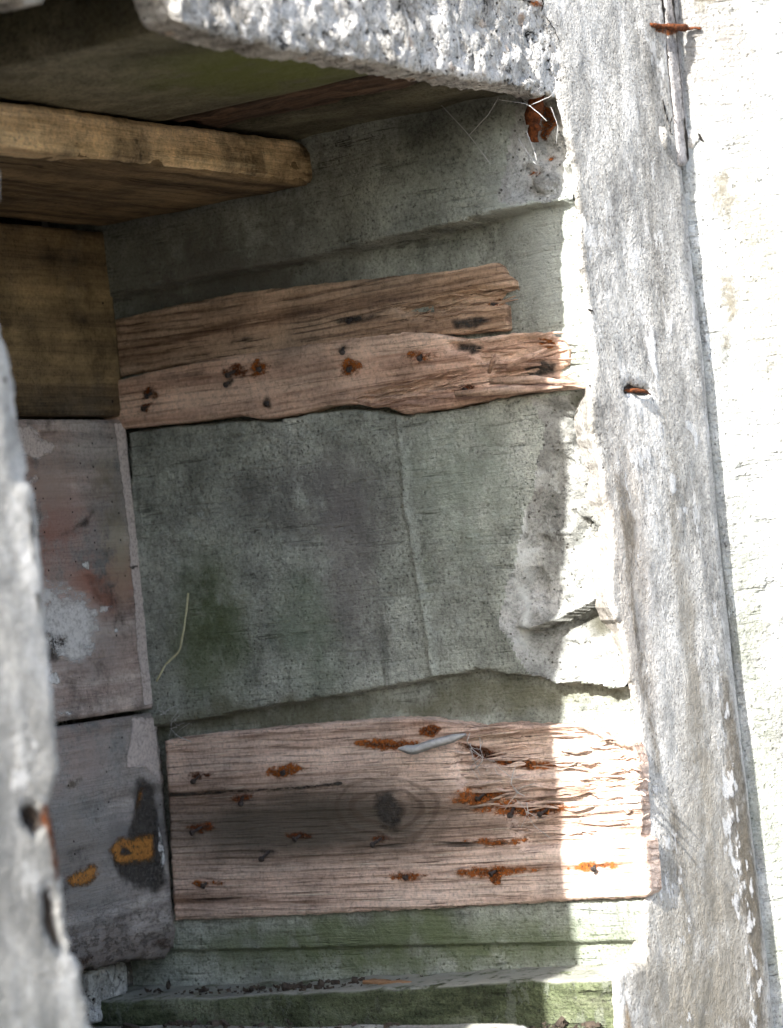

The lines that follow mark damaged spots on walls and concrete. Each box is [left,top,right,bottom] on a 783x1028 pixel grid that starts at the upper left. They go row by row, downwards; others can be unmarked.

spalling [0,0,43,12]
spalling [133,0,574,206]
corrosion [540,106,558,141]
crack [662,0,704,161]
spalling [499,389,627,688]
corrosion [40,806,59,881]
water stain [711,645,763,1028]